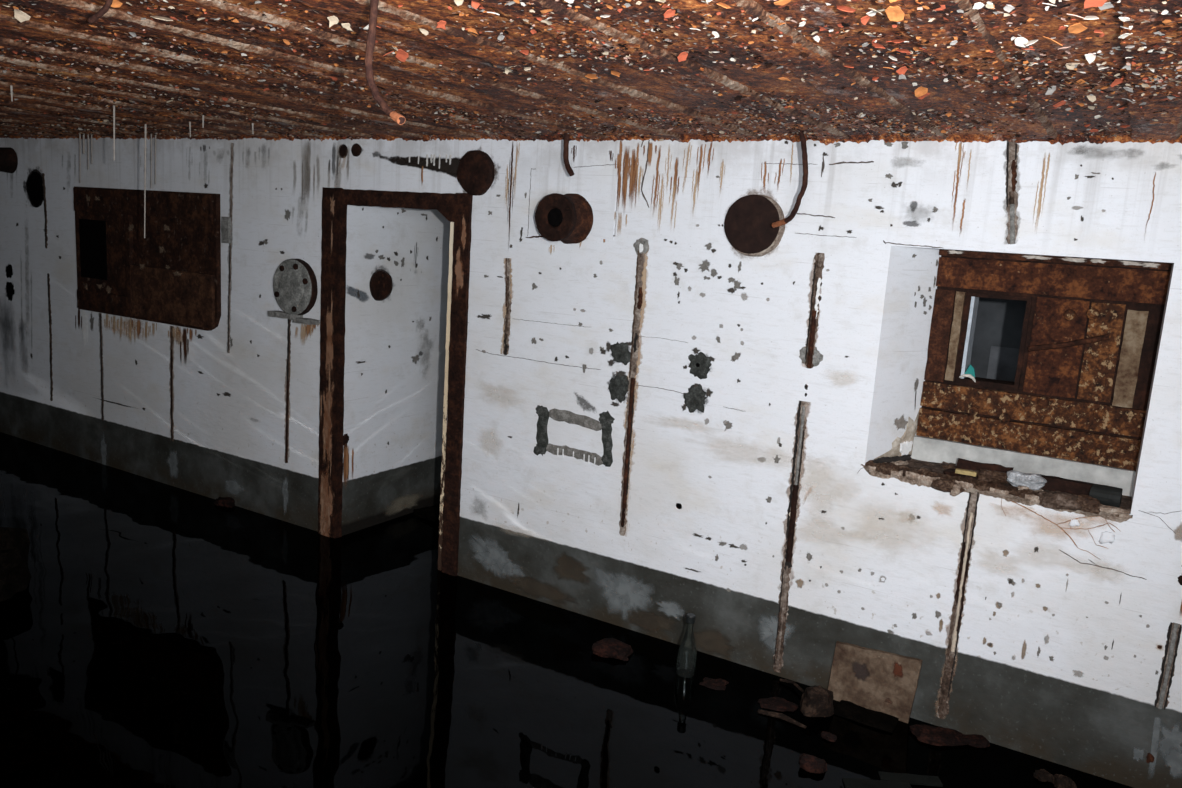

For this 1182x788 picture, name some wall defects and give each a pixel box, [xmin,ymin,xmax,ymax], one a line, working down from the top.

corrosion [609,140,725,229]
corrosion [748,145,793,198]
corrosion [952,143,971,230]
spalling [1005,140,1019,244]
corrosion [1034,154,1050,216]
corrosion [104,314,197,362]
spalling [582,238,649,536]
spalling [758,384,810,673]
crack [1001,498,1180,580]
spalling [937,492,980,719]
spalling [1146,602,1182,773]